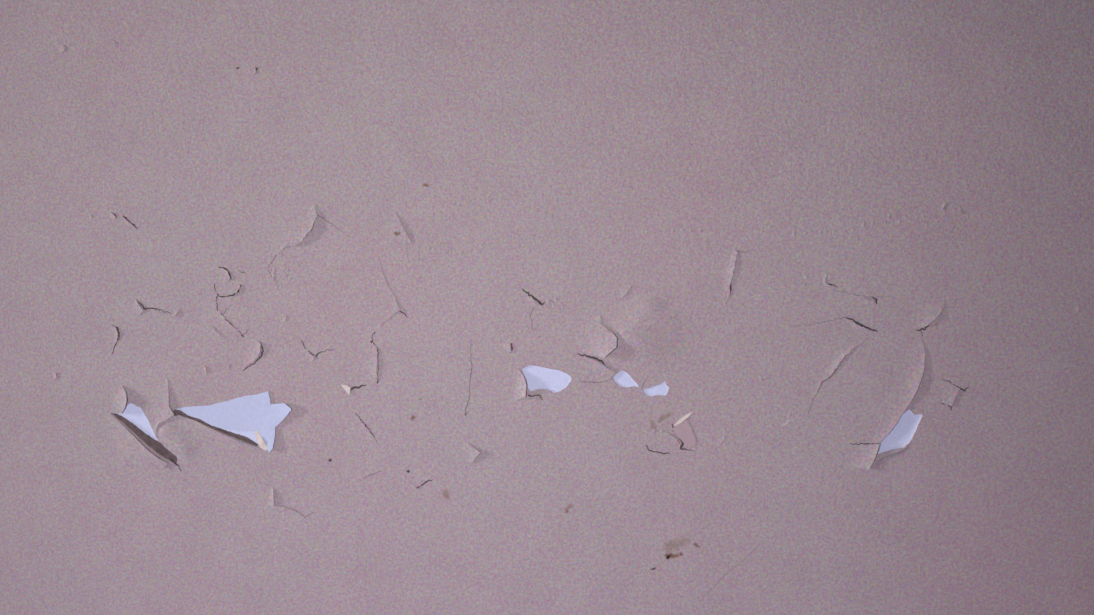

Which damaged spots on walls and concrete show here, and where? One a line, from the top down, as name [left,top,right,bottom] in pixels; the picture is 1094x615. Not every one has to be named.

peeling [268,205,340,268]
peeling [385,212,412,247]
peeling [722,248,752,307]
peeling [341,341,379,395]
peeling [511,315,669,402]
peeling [106,376,292,470]
peeling [646,412,696,462]
peeling [843,332,925,470]